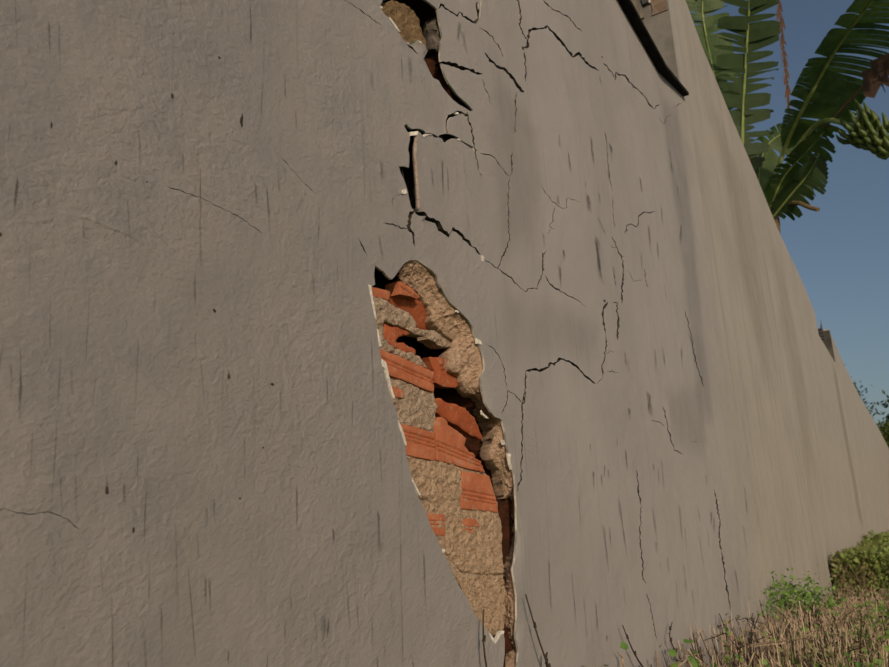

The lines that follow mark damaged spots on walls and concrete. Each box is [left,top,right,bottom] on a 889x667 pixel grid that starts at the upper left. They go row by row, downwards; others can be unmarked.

spalling [381,0,471,208]
crack [433,0,679,132]
crack [385,110,655,491]
crack [685,313,704,387]
crack [0,508,77,528]
spalling [368,260,517,667]
crack [636,470,657,640]
crack [714,490,731,618]